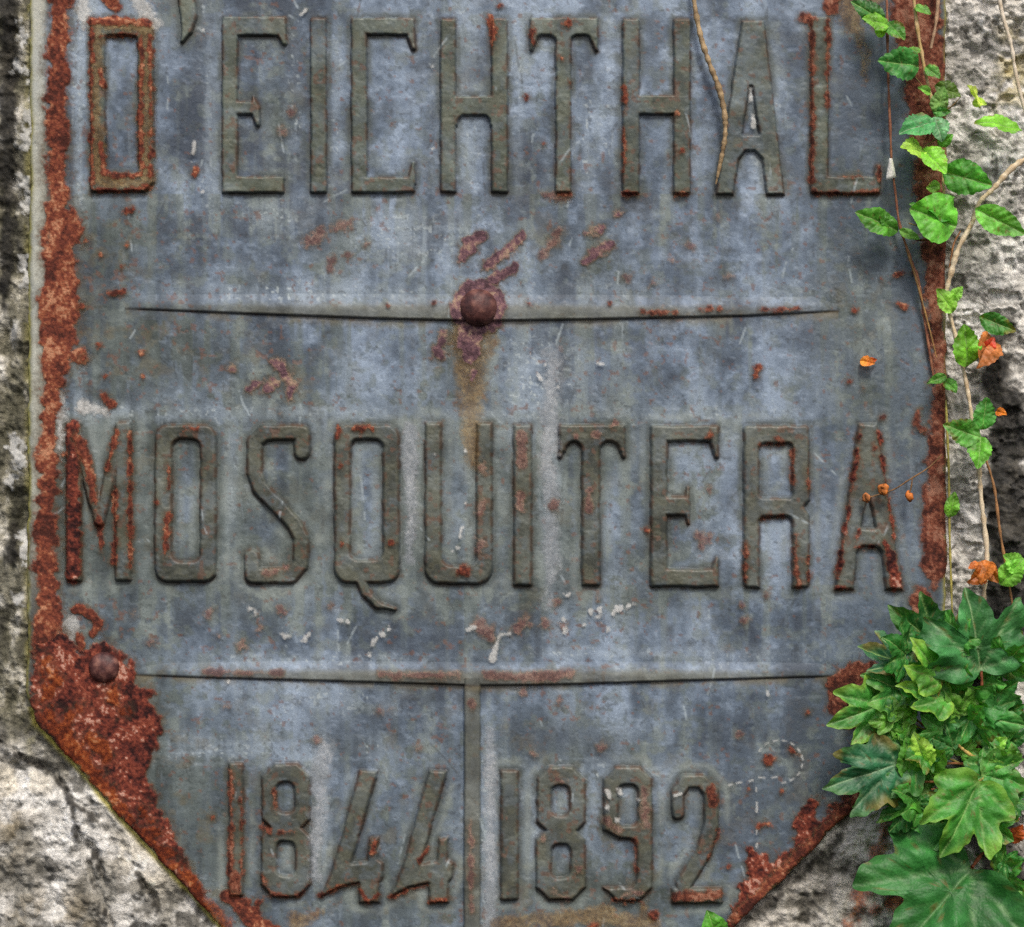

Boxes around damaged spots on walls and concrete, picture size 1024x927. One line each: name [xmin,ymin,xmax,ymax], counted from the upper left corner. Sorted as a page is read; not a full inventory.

corrosion [798,0,882,197]
corrosion [889,0,946,119]
corrosion [910,133,947,202]
corrosion [430,229,526,382]
corrosion [28,0,428,927]
corrosion [834,237,947,613]
corrosion [482,669,575,696]
corrosion [825,660,877,715]
corrosion [763,754,776,766]
corrosion [671,792,860,927]
corrosion [843,891,904,927]
corrosion [870,821,893,860]